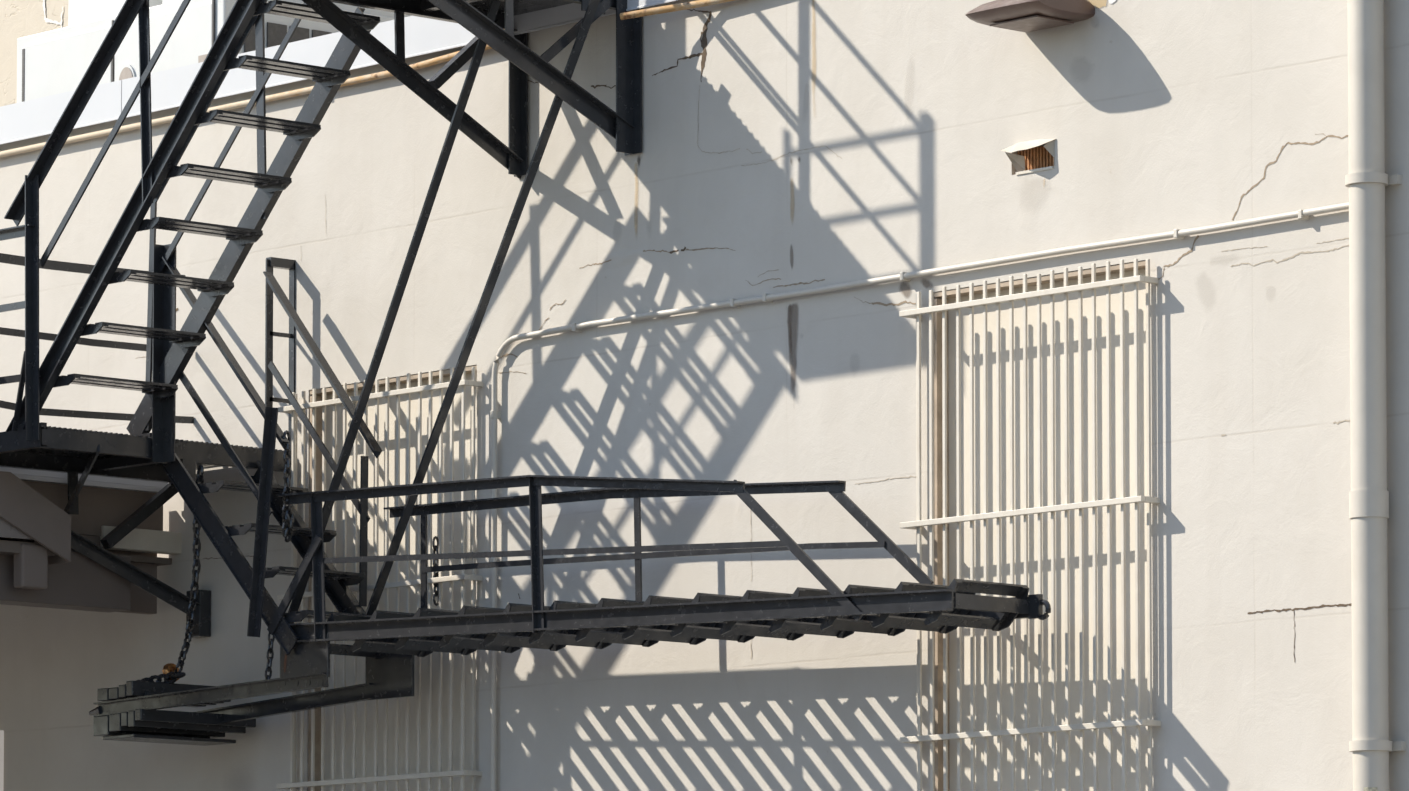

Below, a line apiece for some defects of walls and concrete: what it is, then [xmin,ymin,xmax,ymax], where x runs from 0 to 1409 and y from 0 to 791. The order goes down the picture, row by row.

crack [43,0,63,28]
crack [652,9,842,166]
crack [1159,133,1349,279]